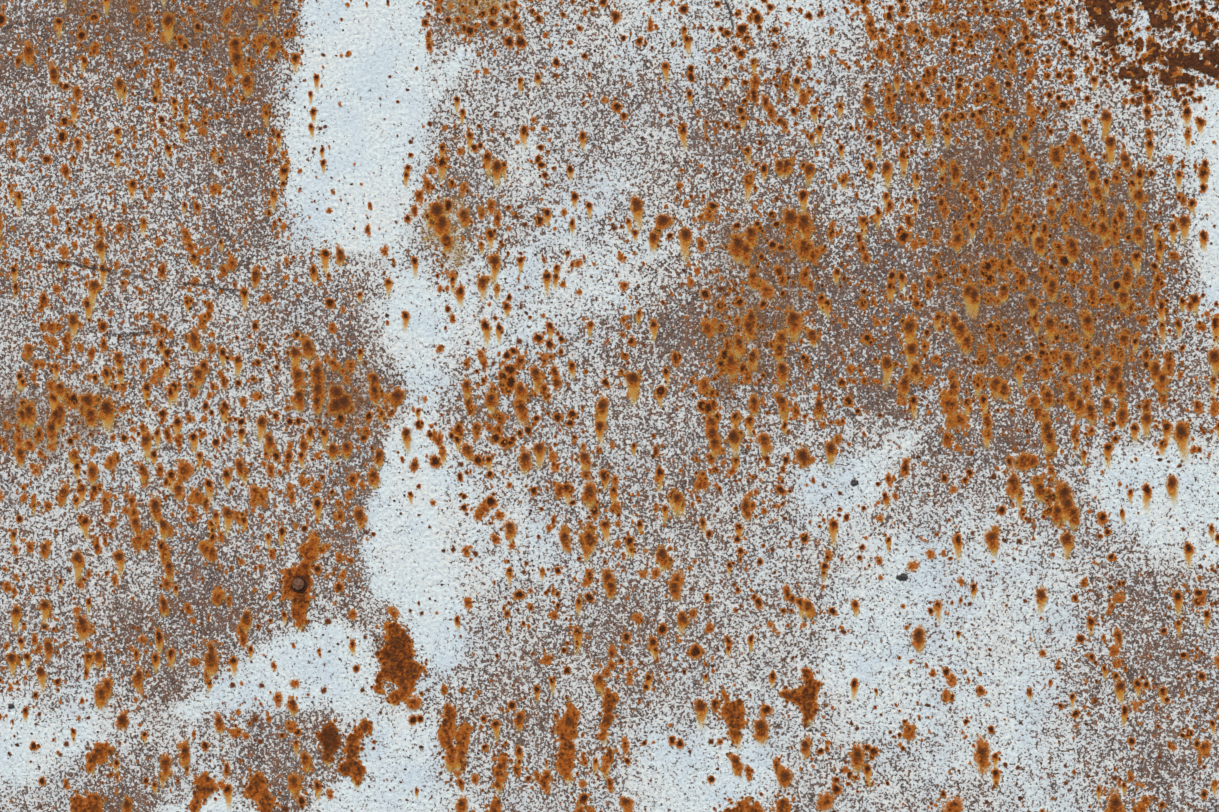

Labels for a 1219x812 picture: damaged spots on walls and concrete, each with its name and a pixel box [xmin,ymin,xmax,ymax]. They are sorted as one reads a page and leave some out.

corrosion [416,0,583,97]
corrosion [282,42,352,136]
corrosion [402,137,414,186]
corrosion [561,191,593,232]
corrosion [374,302,421,327]
corrosion [1118,471,1154,525]
corrosion [441,538,483,576]
corrosion [894,511,978,618]
corrosion [210,585,279,674]
corrosion [409,584,480,638]
corrosion [1020,508,1219,780]
corrosion [1064,749,1167,812]